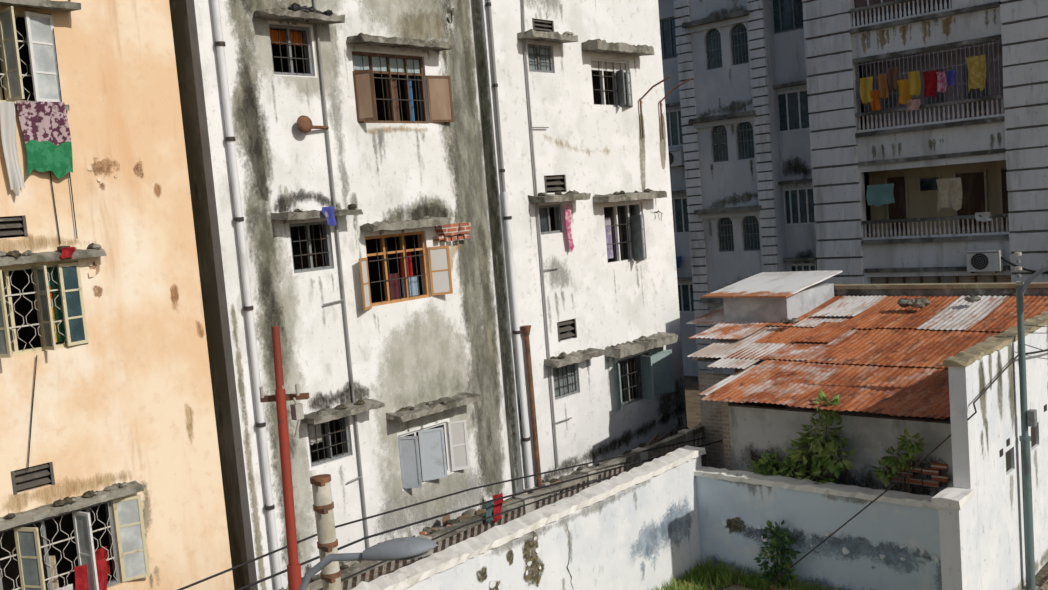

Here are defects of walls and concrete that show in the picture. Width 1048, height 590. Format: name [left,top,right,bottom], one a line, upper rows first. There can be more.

water stain [363,0,457,65]
water stain [244,0,357,228]
water stain [379,198,453,235]
water stain [260,238,499,572]
water stain [979,344,1019,453]
peeling [506,531,544,587]
water stain [632,499,691,575]